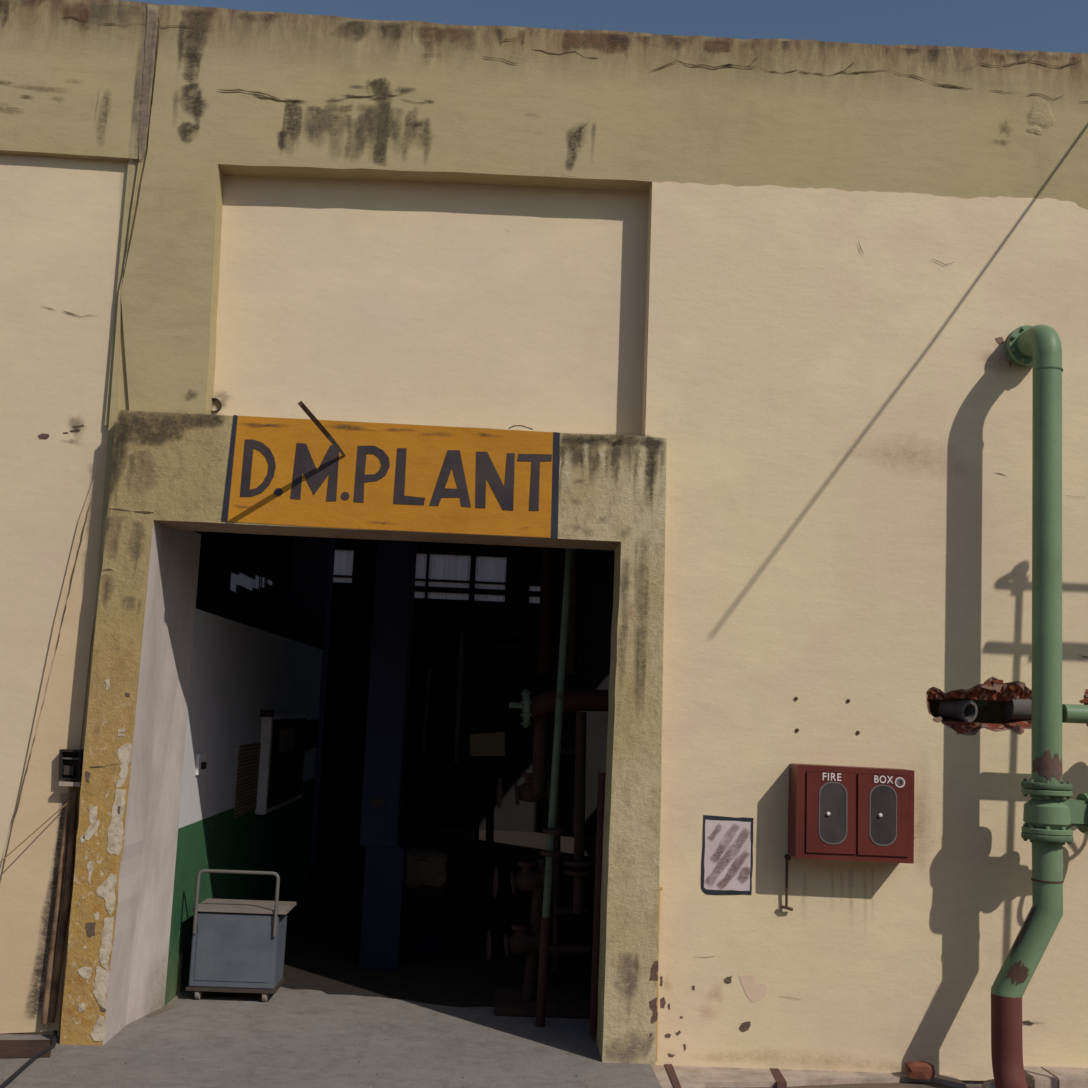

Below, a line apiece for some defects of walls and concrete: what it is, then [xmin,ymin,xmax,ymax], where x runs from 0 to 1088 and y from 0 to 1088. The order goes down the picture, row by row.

leakage [175,10,210,140]
crack [482,39,595,64]
crack [651,54,1088,102]
leakage [279,78,430,163]
leakage [108,413,222,497]
spalling [926,677,1032,735]
peeling [80,728,132,856]
peeling [78,860,117,1041]
spalling [650,960,670,1037]